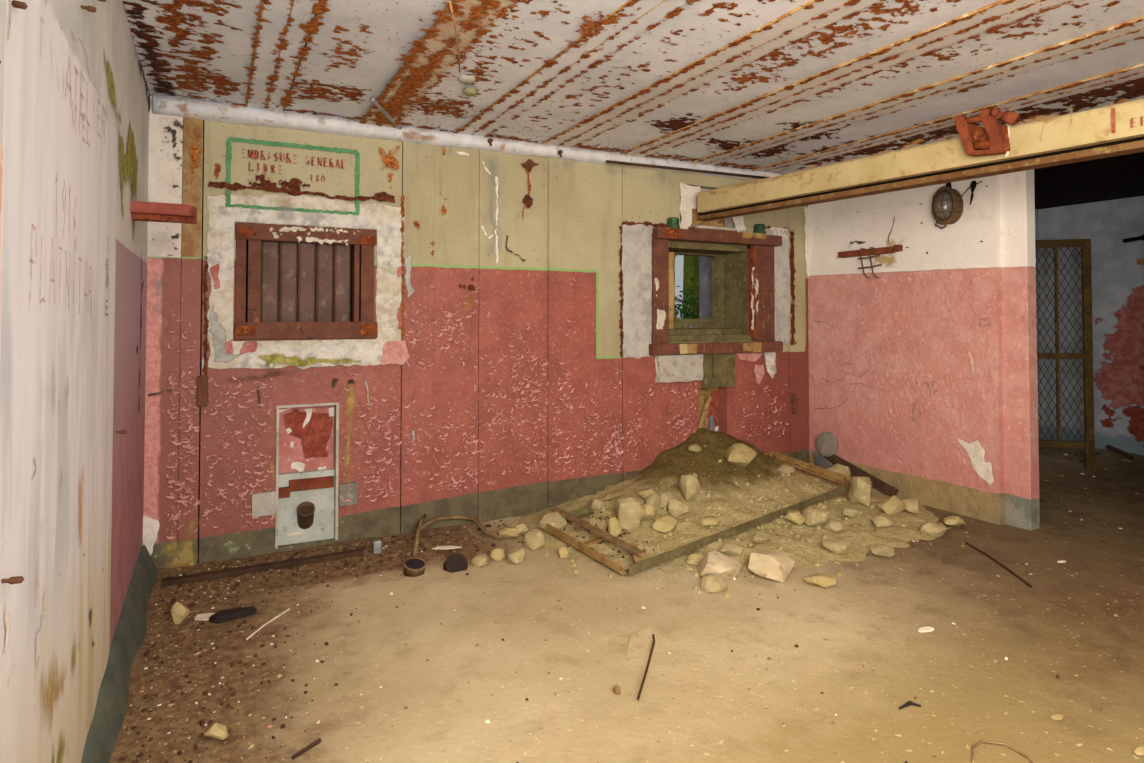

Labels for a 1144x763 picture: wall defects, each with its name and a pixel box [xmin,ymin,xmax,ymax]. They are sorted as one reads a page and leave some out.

leakage [104,53,138,236]
rust [122,0,1144,345]
flaking render [143,194,698,556]
rust [618,221,667,357]
peeling [957,438,993,484]
peeling [1093,285,1144,442]